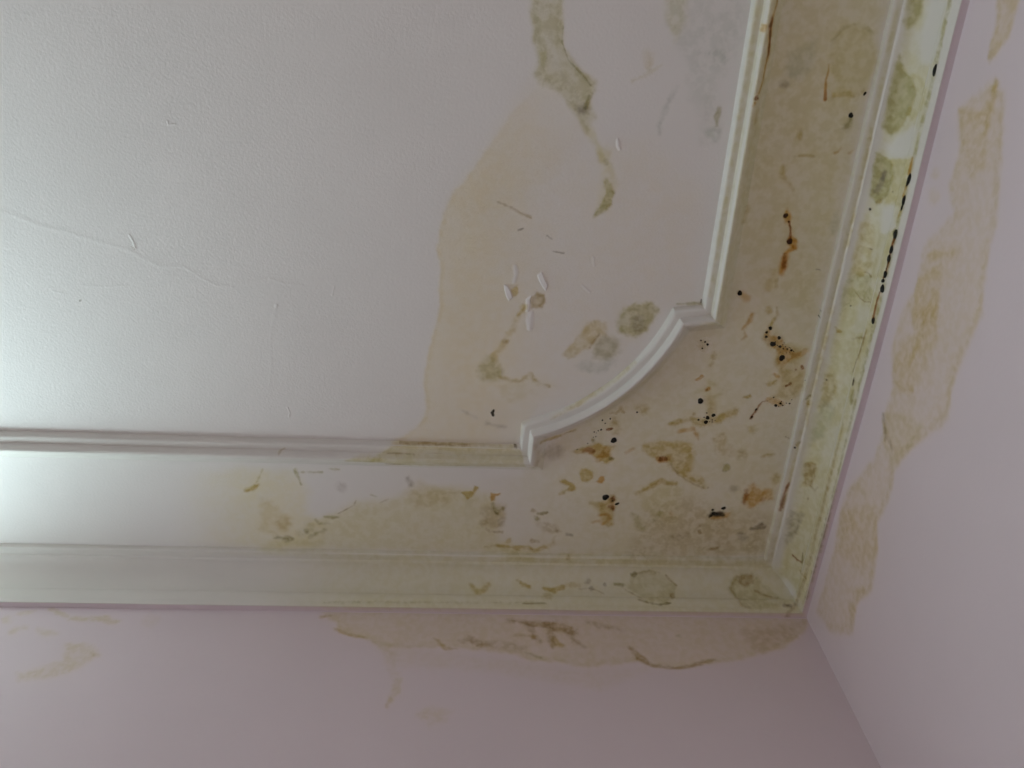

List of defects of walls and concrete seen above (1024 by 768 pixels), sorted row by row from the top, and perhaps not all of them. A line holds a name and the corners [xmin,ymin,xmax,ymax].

damp [765,326,794,361]